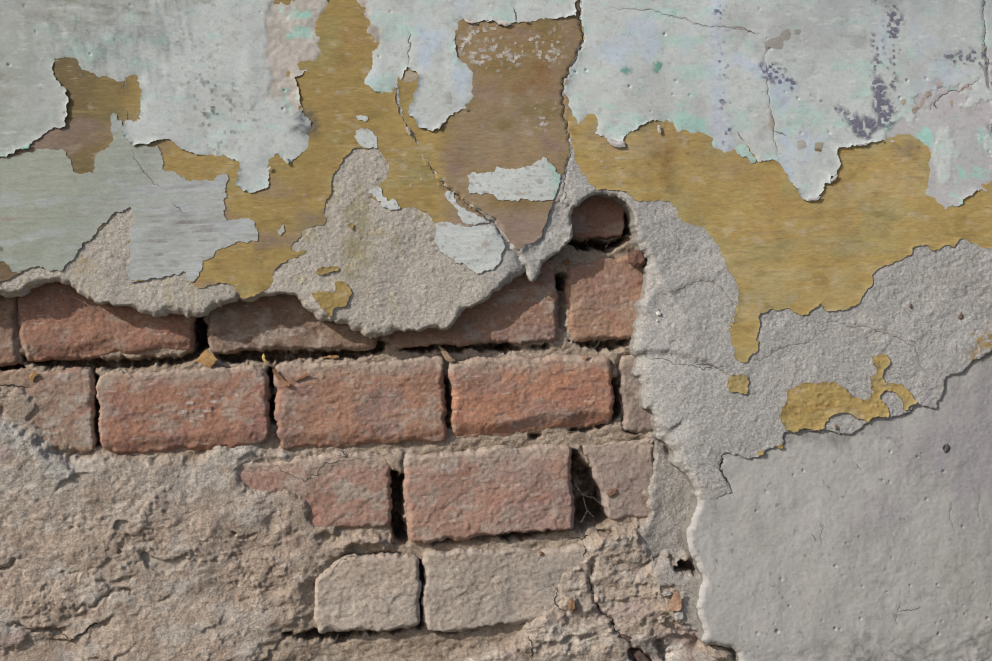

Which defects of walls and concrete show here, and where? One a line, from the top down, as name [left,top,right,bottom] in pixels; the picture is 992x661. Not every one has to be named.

crack [561,3,584,199]
crack [611,6,785,157]
spalling [0,0,992,500]
crack [569,524,632,647]